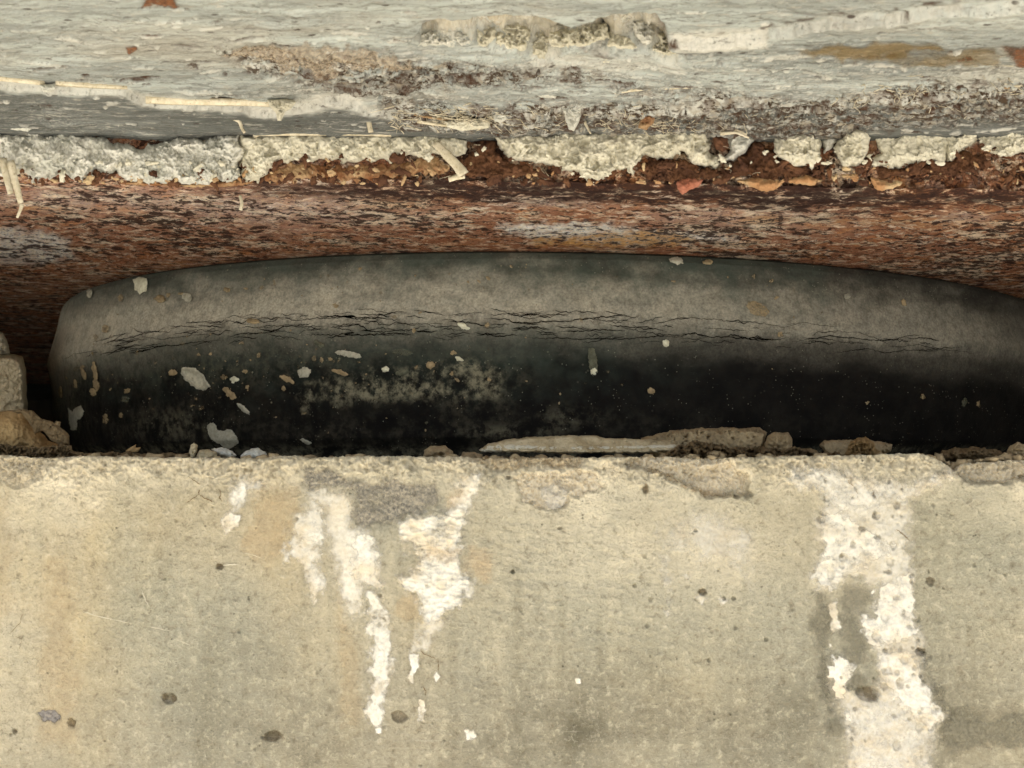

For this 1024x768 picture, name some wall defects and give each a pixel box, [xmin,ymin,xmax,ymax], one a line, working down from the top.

spalling [418,13,676,63]
corrosion [712,136,729,153]
corrosion [676,178,703,195]
corrosion [737,175,819,192]
corrosion [842,174,902,191]
crack [65,308,973,359]
water stain [221,480,261,534]
water stain [399,474,482,683]
water stain [284,489,394,734]
water stain [792,468,1024,768]